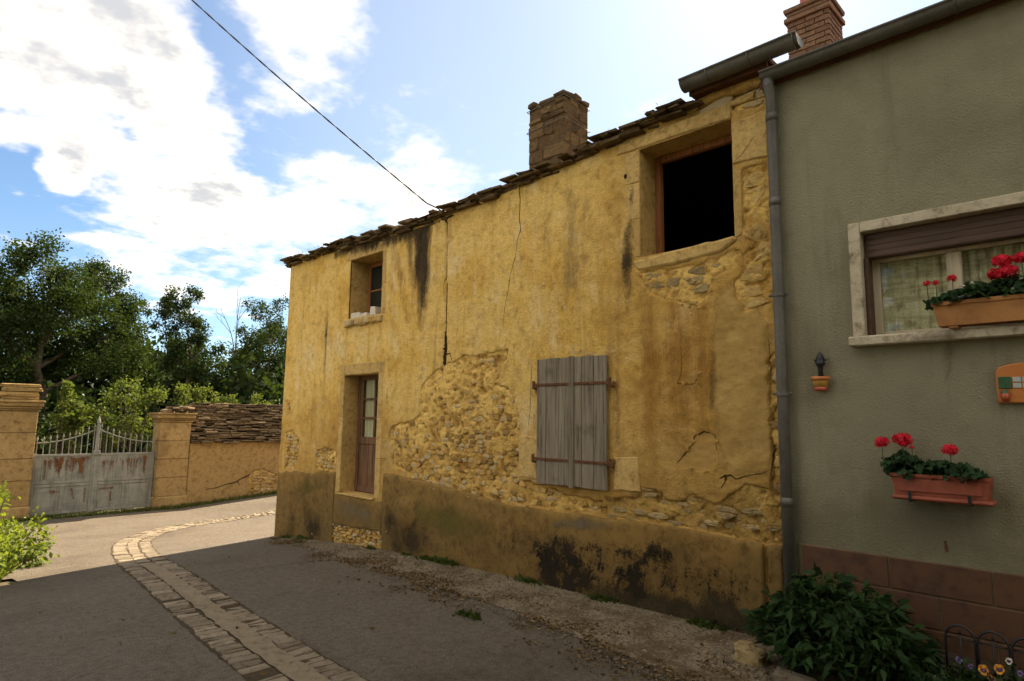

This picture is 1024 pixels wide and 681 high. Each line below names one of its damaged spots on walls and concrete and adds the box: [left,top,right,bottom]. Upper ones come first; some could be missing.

leakage [334,226,430,316]
crack [439,210,454,366]
leakage [621,219,631,286]
spalling [638,248,745,309]
corrosion [43,456,89,501]
spalling [248,431,299,495]
spalling [389,349,782,544]
crack [677,431,717,463]
crack [719,445,776,487]
leakage [532,521,765,638]